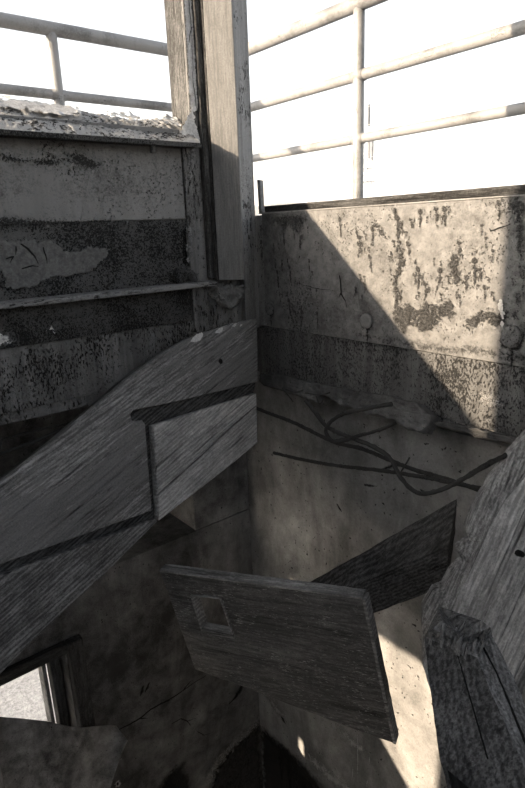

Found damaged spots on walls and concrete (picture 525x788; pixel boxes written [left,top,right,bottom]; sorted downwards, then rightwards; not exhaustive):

peeling [0,95,83,116]
peeling [105,110,140,121]
peeling [0,214,128,228]
rust [496,197,525,260]
peeling [0,238,110,290]
rust [270,211,310,326]
rust [463,251,498,303]
rust [353,315,525,366]